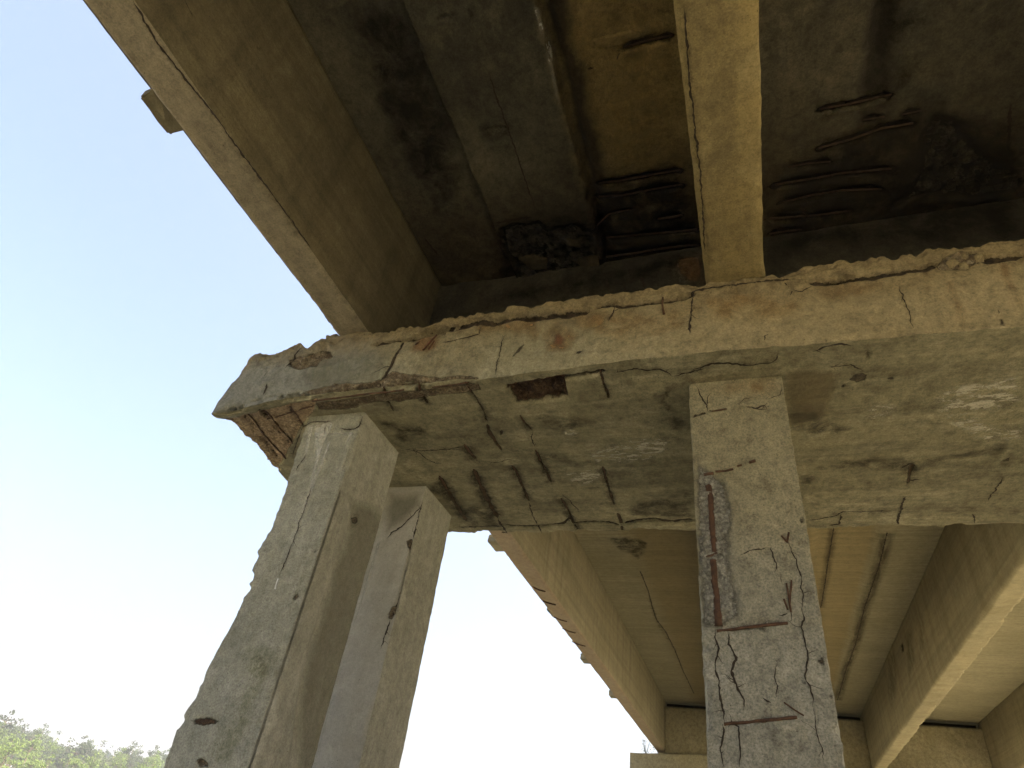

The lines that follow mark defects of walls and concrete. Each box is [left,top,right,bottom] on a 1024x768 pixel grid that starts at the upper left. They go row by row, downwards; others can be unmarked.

crack [684,10,706,251]
spalling [285,349,332,370]
spalling [227,371,503,471]
spalling [507,369,609,402]
crack [280,413,365,574]
crack [455,516,691,528]
spalling [698,459,792,632]
crack [640,571,694,693]
crack [714,630,771,767]
crack [741,509,900,760]